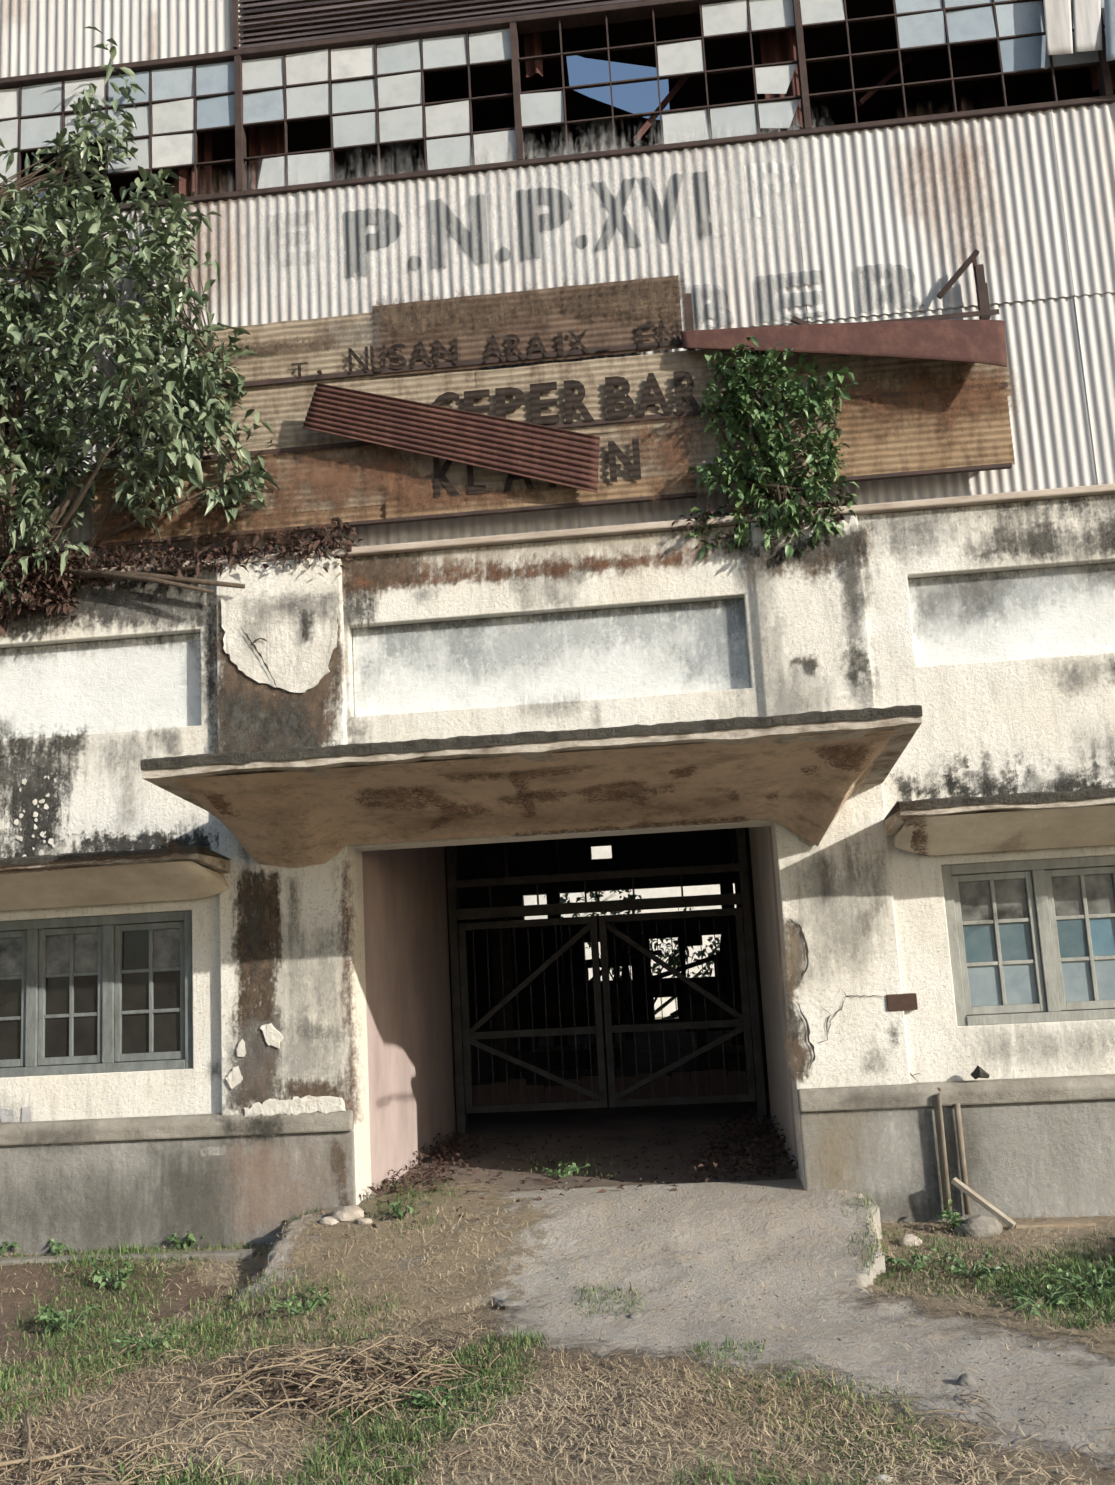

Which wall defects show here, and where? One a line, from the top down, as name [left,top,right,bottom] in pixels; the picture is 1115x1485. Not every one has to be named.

water stain [0,723,212,874]
water stain [0,570,219,755]
crack [240,627,278,689]
spalling [215,531,744,755]
water stain [443,508,943,696]
water stain [763,676,821,716]
water stain [900,754,1031,801]
water stain [921,496,1115,623]
water stain [1047,737,1115,792]
spalling [226,870,346,1117]
spalling [784,921,810,1082]
crack [789,918,882,1069]